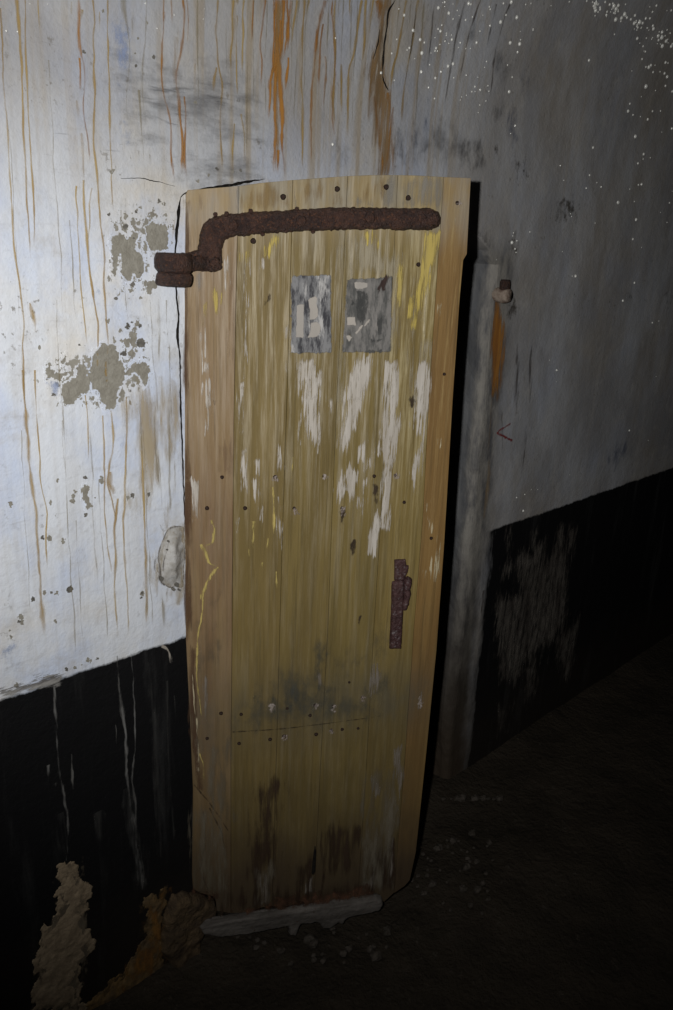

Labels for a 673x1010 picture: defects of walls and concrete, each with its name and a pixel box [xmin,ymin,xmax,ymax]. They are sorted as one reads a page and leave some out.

corrosion [16,0,35,241]
corrosion [78,0,105,259]
corrosion [168,97,186,165]
corrosion [230,0,309,163]
corrosion [301,0,374,159]
crack [373,1,395,91]
corrosion [75,180,107,376]
peeling [106,199,181,300]
peeling [36,317,153,413]
corrosion [22,334,48,574]
corrosion [102,417,128,619]
spalling [30,861,167,1010]